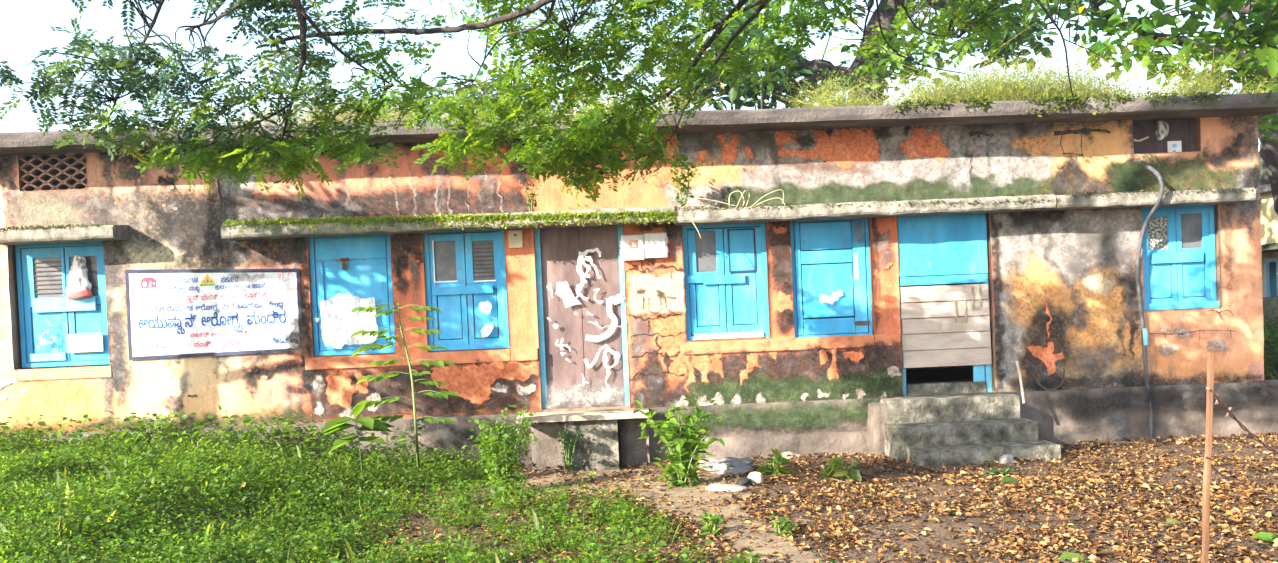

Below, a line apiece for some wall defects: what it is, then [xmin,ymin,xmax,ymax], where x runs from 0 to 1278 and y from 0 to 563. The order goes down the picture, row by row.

spalling [1250,115,1260,158]
leakage [0,138,549,428]
peeling [244,359,541,421]
peeling [574,237,904,408]
peeling [649,122,1142,393]
leakage [991,210,1278,442]